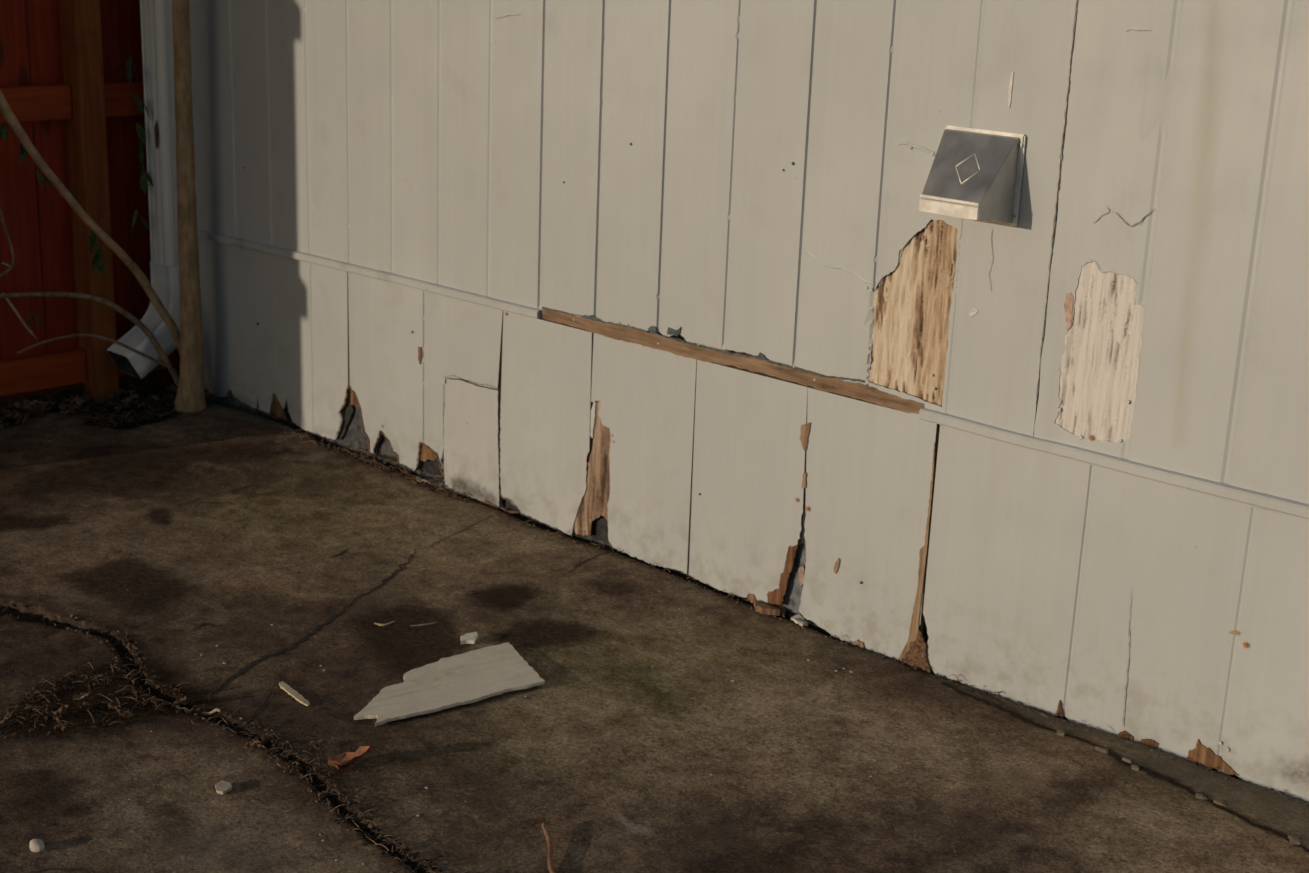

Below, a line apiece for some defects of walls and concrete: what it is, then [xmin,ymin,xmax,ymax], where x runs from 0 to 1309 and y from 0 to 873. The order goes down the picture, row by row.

peeling [542,220,958,406]
peeling [1055,259,1144,443]
spalling [334,386,399,464]
spalling [416,442,444,479]
peeling [800,423,811,451]
leakage [61,559,187,608]
spalling [591,516,609,542]
spalling [783,542,808,627]
peeling [897,443,935,674]
leakage [499,619,594,647]
crack [0,515,491,873]
peeling [1186,739,1239,776]